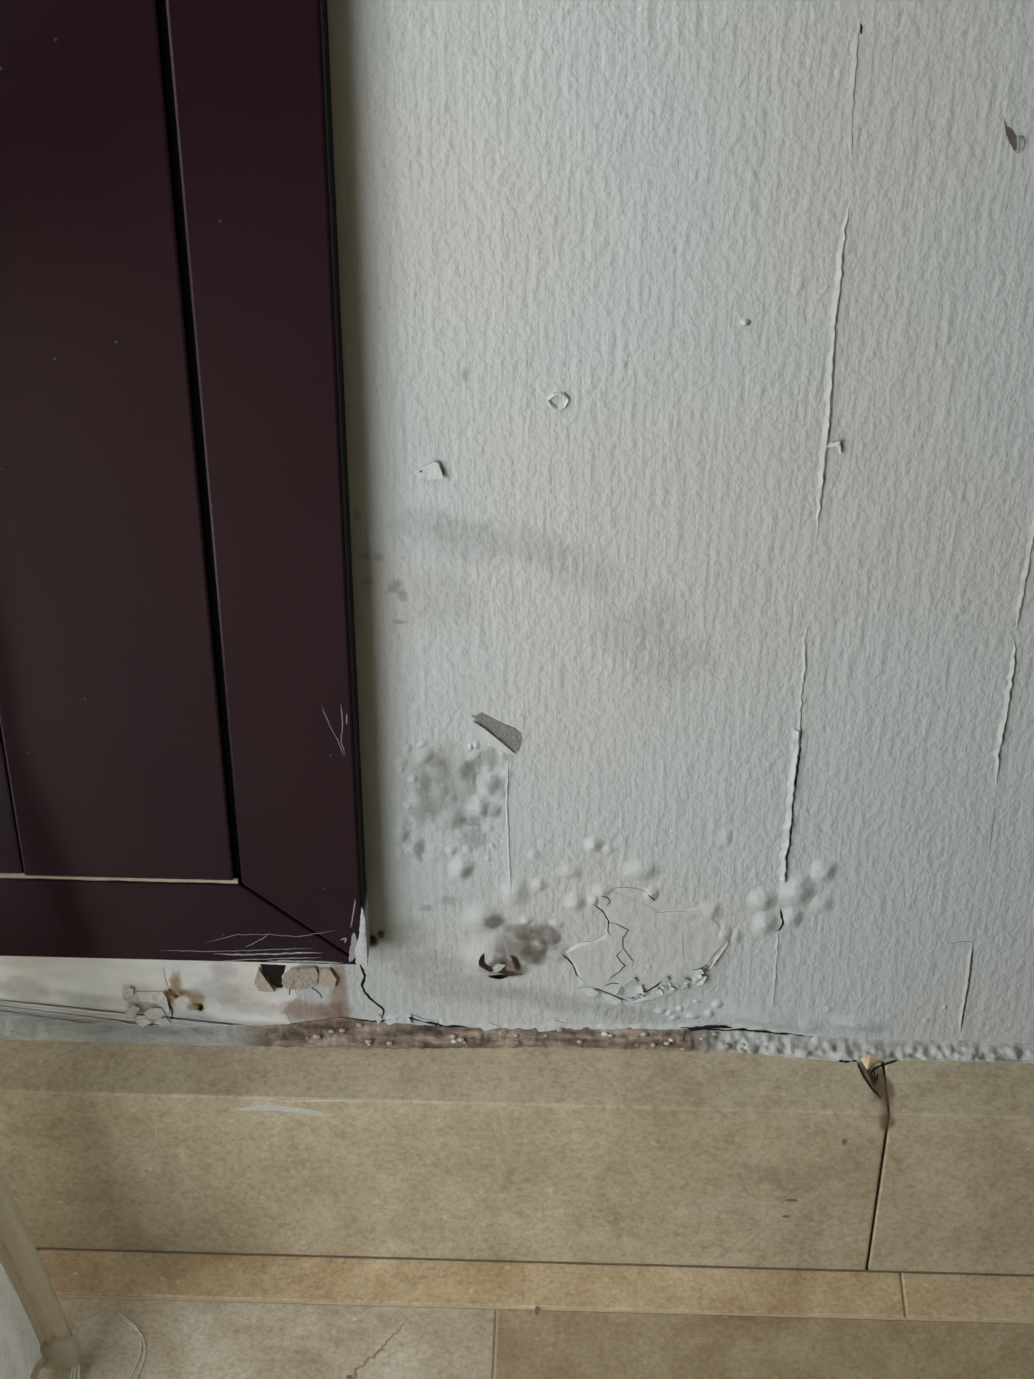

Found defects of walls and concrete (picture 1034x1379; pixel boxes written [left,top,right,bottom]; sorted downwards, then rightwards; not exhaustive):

crack [846,14,863,163]
crack [815,197,853,530]
crack [989,512,1034,856]
peeling [470,712,522,896]
crack [340,622,853,1038]
flaking render [121,967,173,1027]
flaking render [254,964,337,998]